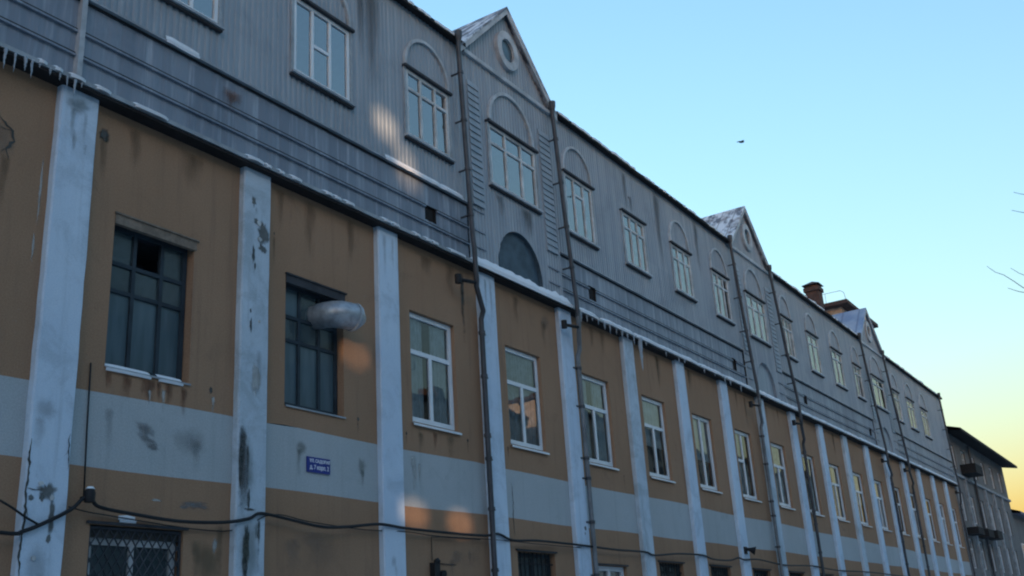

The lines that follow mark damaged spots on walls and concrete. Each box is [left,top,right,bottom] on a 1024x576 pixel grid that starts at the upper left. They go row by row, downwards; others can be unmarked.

flaking render [252,218,269,268]
crack [17,439,47,574]
flaking render [29,481,56,543]